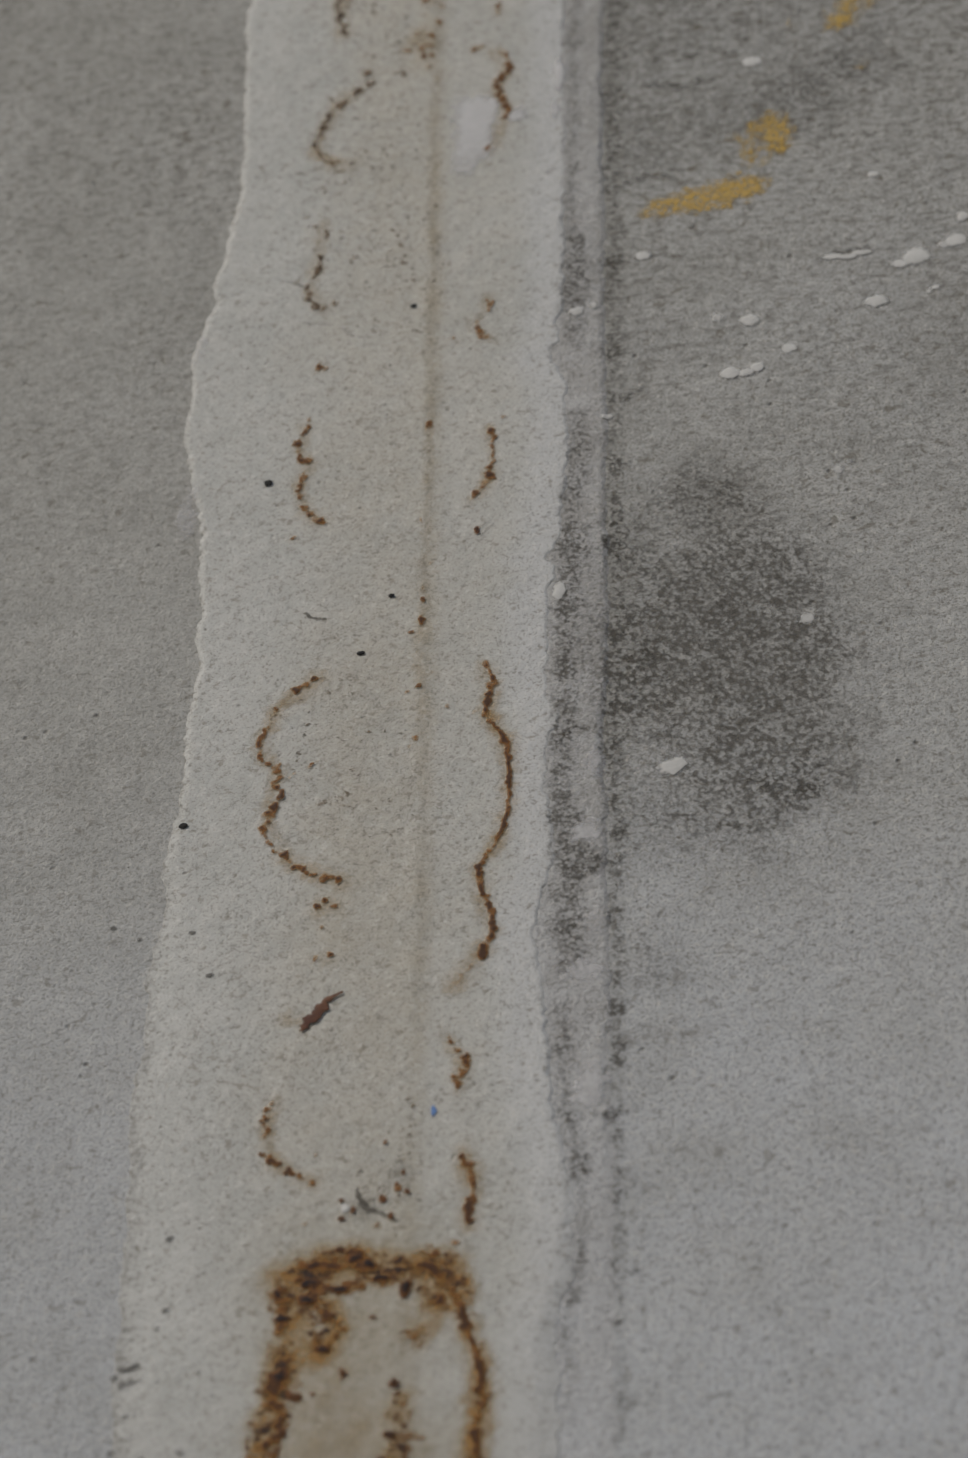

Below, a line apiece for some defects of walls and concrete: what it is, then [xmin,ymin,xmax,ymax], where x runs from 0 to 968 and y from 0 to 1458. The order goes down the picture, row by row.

corrosion [493,50,514,118]
water stain [601,1,649,379]
water stain [560,235,589,331]
corrosion [292,418,326,524]
corrosion [472,416,504,498]
water stain [547,393,853,1066]
corrosion [256,707,342,928]
corrosion [460,660,512,975]
corrosion [300,991,343,1032]
corrosion [258,1103,315,1186]
corrosion [458,1153,477,1224]
corrosion [245,1240,492,1458]